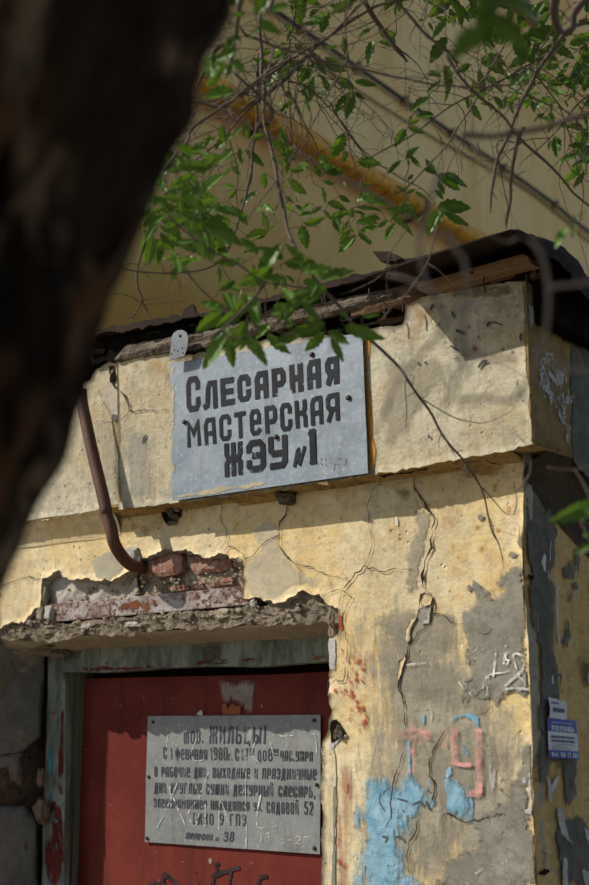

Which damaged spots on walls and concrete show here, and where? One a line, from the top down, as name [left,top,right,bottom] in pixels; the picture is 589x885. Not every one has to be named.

crack [98,383,169,427]
flaking render [7,546,244,658]
corrosion [120,599,157,612]
flaking render [178,598,271,625]
flaking render [319,603,343,671]
crack [221,467,491,828]
peeling [557,554,580,647]
flaking render [0,711,64,885]
crack [406,731,502,874]
peeling [521,771,532,824]
peeling [548,758,589,885]